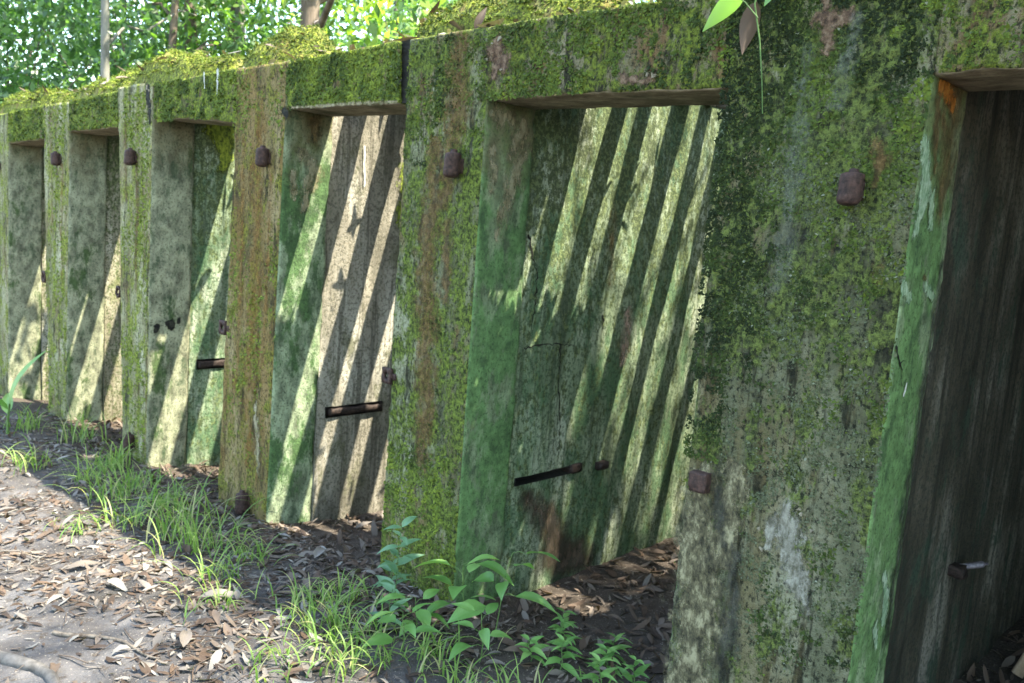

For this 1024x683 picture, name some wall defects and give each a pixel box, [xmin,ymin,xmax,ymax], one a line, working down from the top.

corrosion [938,79,956,114]
crack [524,234,574,454]